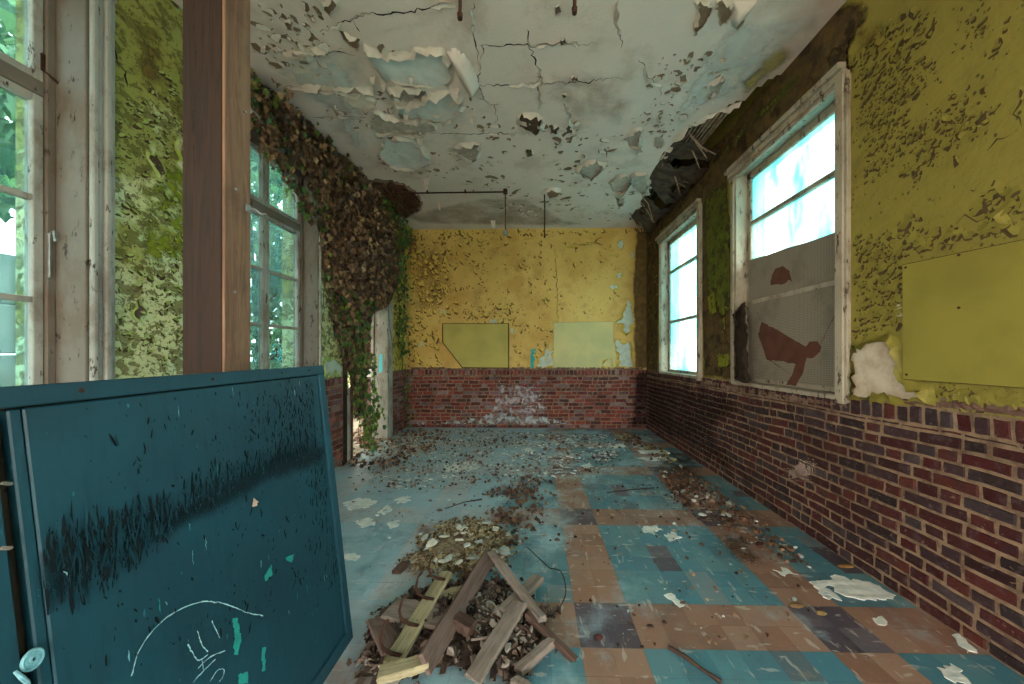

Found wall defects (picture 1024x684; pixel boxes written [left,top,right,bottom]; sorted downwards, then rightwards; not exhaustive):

peeling [115,70,183,367]
crack [259,0,663,136]
peeling [250,0,729,376]
peeling [693,0,745,36]
peeling [850,4,1001,188]
flaking render [847,179,1024,417]
peeling [951,7,1015,60]
damp [418,383,566,425]